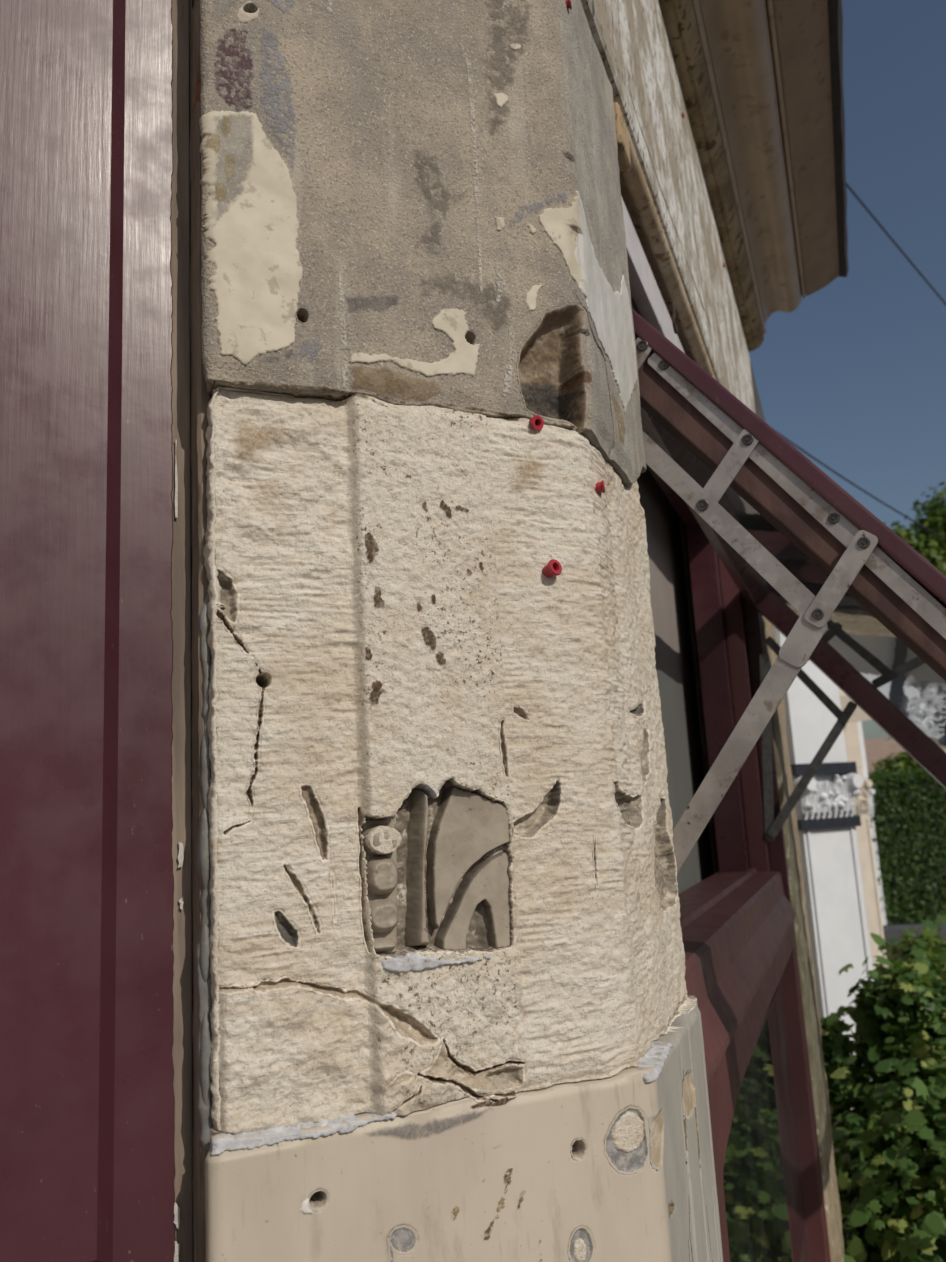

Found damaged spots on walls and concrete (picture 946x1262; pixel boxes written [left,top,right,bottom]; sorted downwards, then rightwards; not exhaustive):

damp [485,0,529,133]
peeling [349,308,480,377]
spalling [517,284,589,434]
crack [213,601,267,837]
spalling [613,700,678,912]